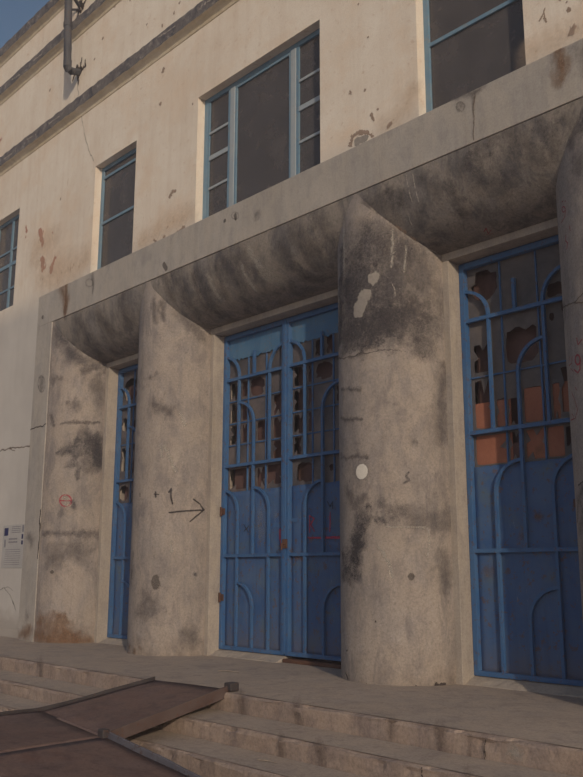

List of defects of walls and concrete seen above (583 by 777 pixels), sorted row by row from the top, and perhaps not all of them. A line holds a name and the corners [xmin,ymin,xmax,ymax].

flaking render [348,130,374,147]
peeling [38,228,57,274]
crack [0,424,45,452]